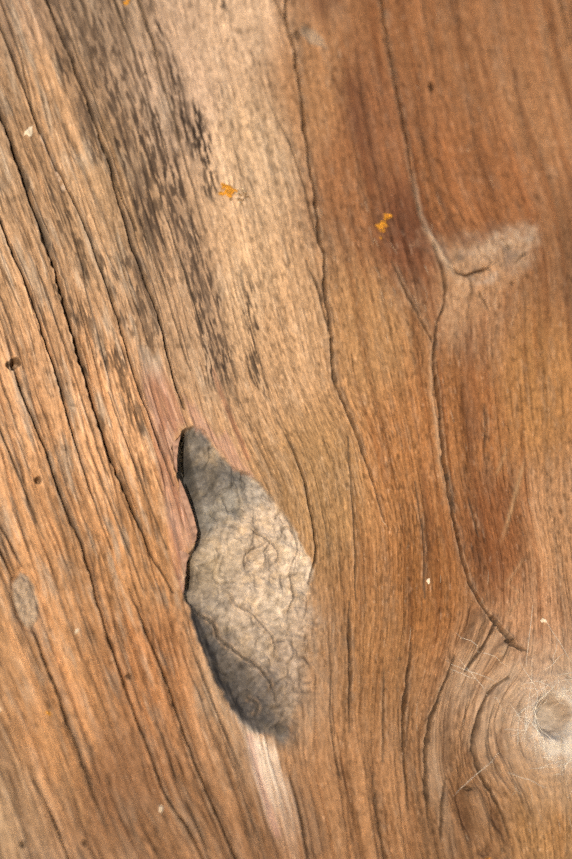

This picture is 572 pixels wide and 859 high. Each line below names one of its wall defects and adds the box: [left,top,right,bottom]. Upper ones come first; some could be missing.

crack [0,0,185,592]
crack [0,314,204,859]
crack [128,589,239,859]
crack [195,435,318,718]
crack [268,0,386,521]
crack [379,0,527,839]